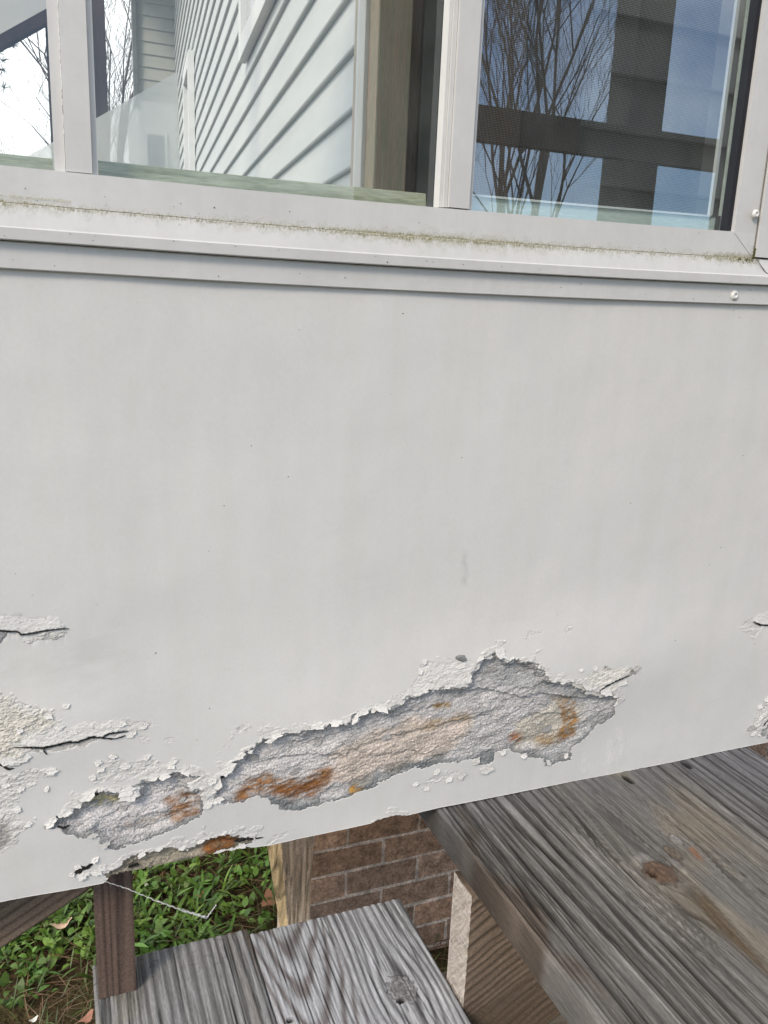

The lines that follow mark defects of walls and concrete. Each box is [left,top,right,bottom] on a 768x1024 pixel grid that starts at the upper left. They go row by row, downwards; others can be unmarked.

peeling [738,612,768,641]
crack [10,717,160,755]
corrosion [558,707,578,739]
peeling [746,697,768,739]
peeling [0,639,641,881]
corrosion [239,769,331,799]
corrosion [166,793,197,820]
corrosion [204,836,236,853]